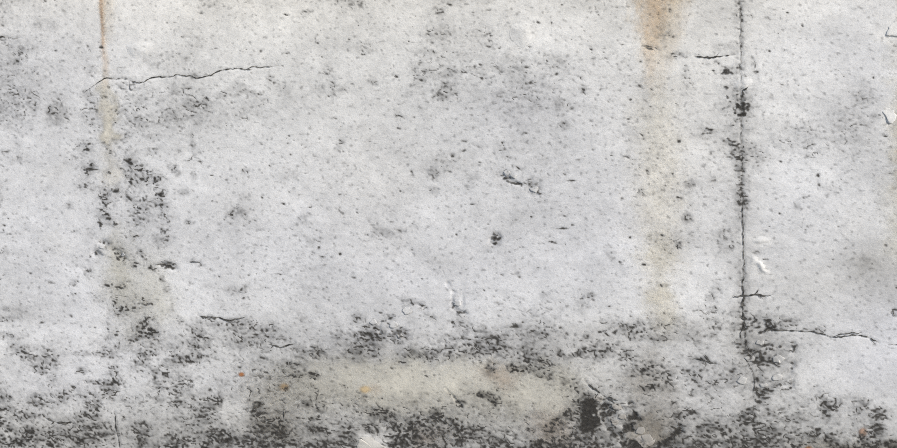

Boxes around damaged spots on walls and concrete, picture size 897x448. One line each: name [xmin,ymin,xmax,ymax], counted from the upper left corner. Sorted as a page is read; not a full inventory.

crack [86,65,277,91]
crack [643,1,897,392]
leakage [287,359,603,448]
leakage [0,417,59,447]
leakage [166,406,306,448]